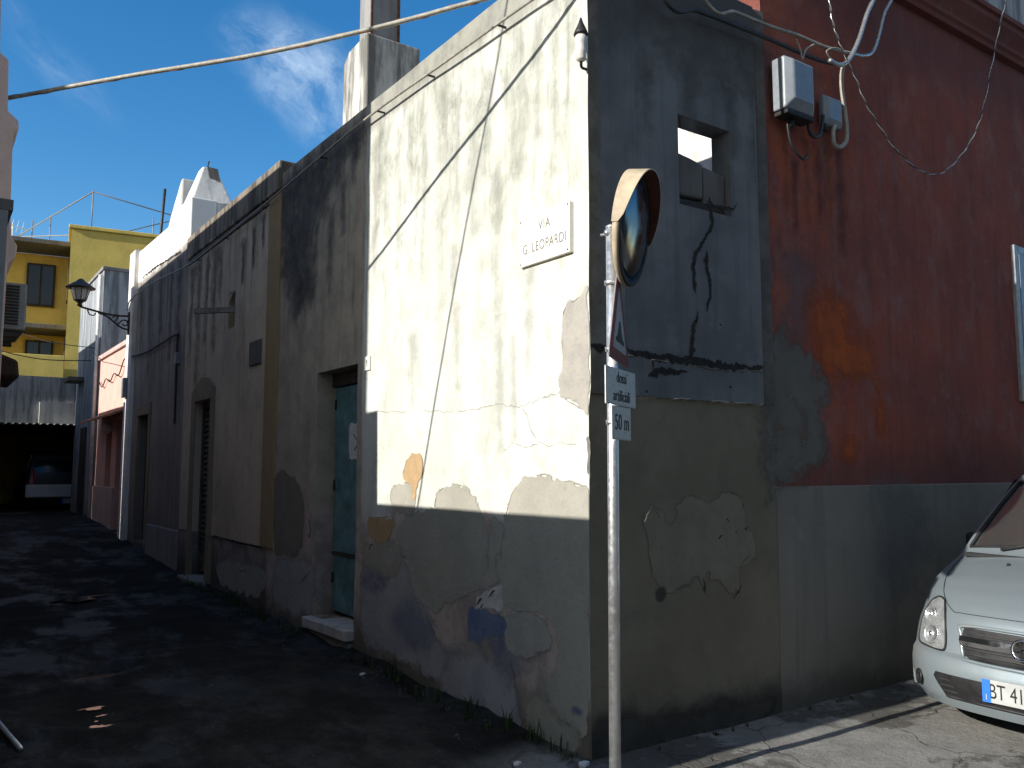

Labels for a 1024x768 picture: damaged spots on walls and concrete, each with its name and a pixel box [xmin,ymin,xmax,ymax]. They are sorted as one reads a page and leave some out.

water stain [281,124,365,318]
peeling [403,453,424,500]
crack [375,392,575,450]
peeling [558,285,590,415]
crack [591,197,763,378]
peeling [360,555,581,753]